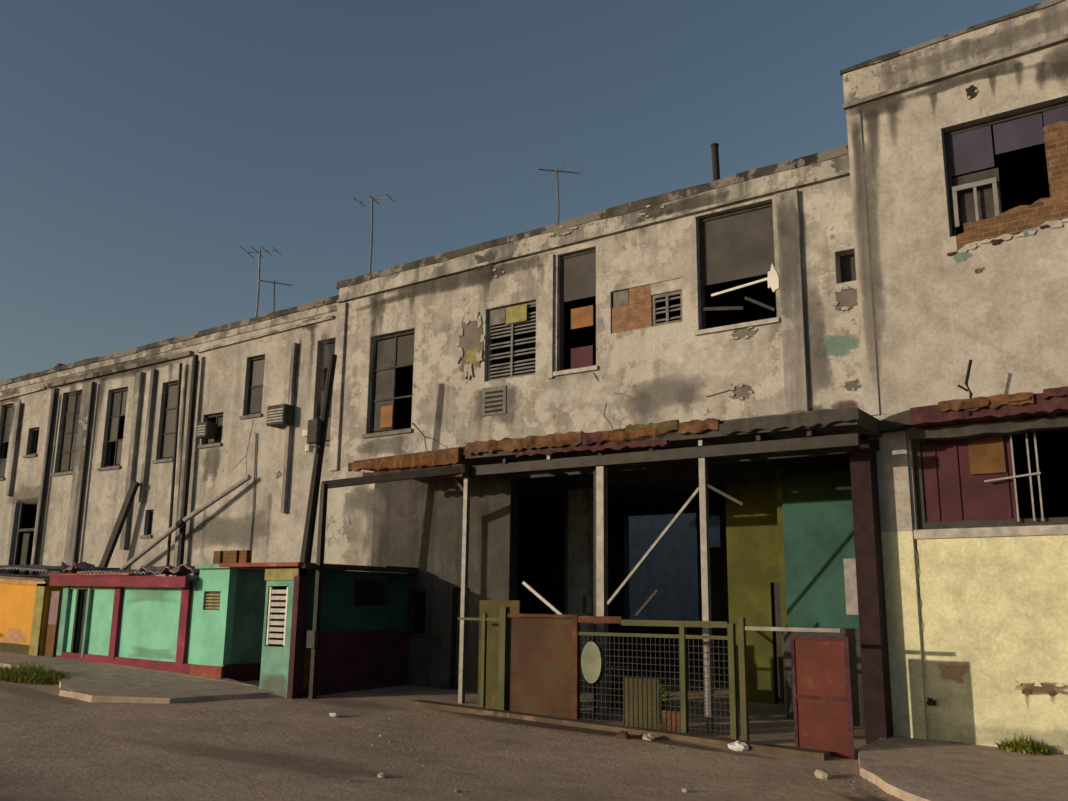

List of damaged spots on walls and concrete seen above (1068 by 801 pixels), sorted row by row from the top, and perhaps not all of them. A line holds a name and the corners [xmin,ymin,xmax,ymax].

damp [932,11,1068,60]
damp [916,61,1020,103]
damp [1038,48,1068,79]
spalling [947,204,1068,262]
spalling [455,312,486,380]
peeling [823,336,857,355]
crack [916,540,927,670]
peeling [939,664,967,683]
peeling [1012,680,1068,697]